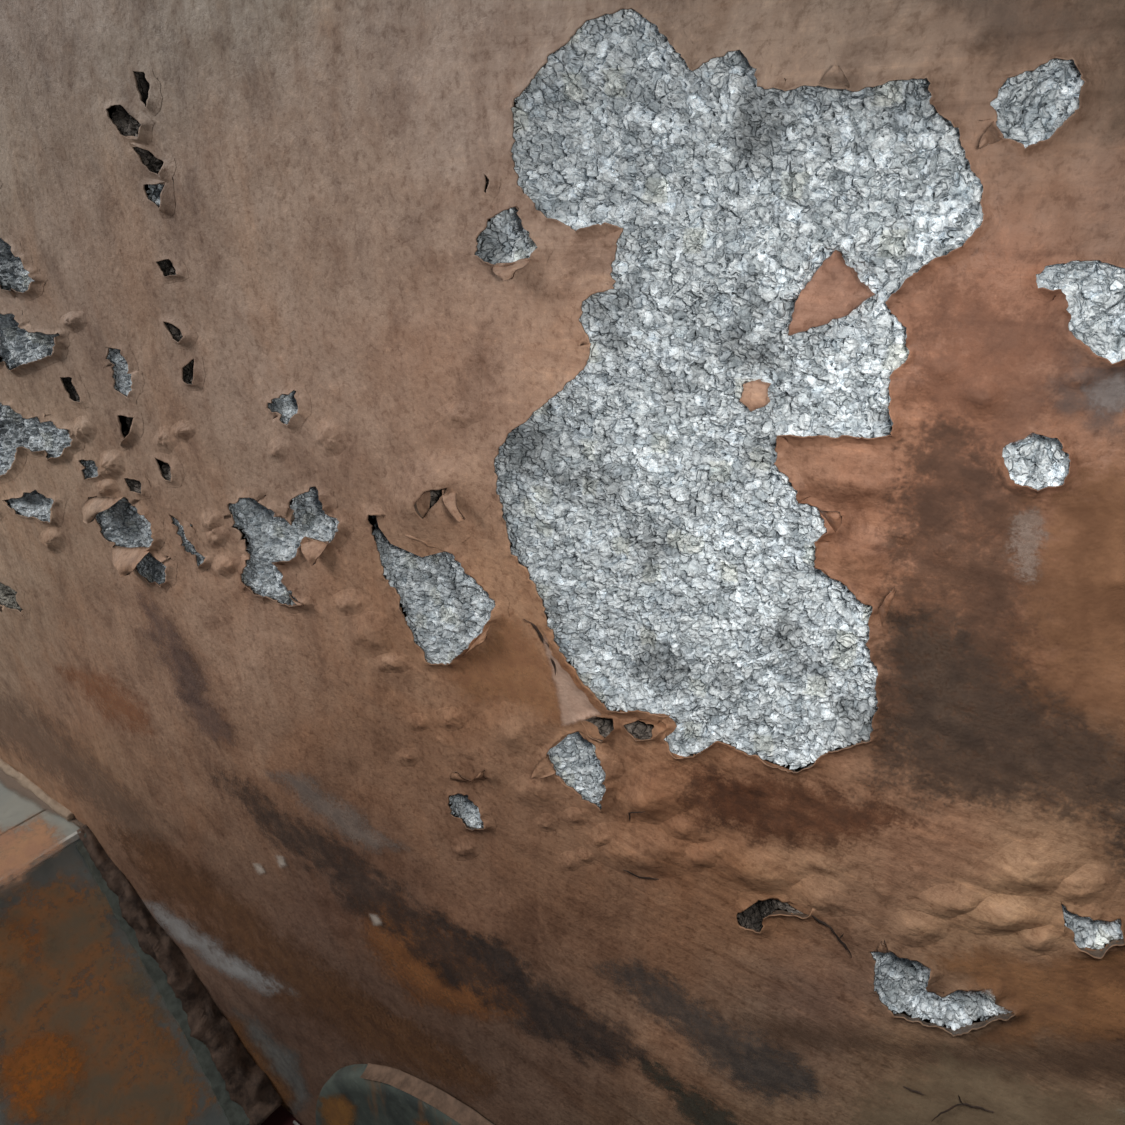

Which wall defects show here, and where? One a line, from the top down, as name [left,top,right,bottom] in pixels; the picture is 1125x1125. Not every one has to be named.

spalling [1020,246,1125,376]
spalling [0,227,214,592]
spalling [218,0,1105,818]
water stain [875,615,1125,870]
water stain [146,902,298,996]
water stain [213,771,742,1125]
spalling [725,893,822,939]
water stain [595,960,1125,1125]
spalling [857,940,1021,1038]
spalling [1045,895,1125,959]